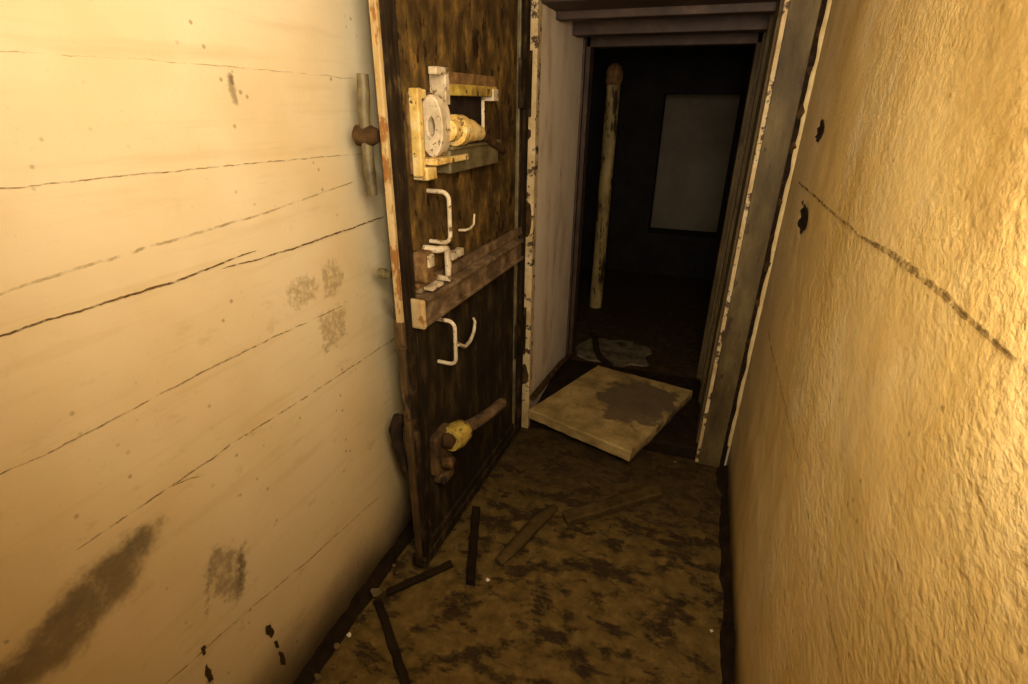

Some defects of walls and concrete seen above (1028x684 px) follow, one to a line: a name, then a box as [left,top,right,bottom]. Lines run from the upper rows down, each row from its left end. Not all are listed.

crack [0,217,382,337]
crack [798,182,1028,375]
water stain [0,527,151,684]